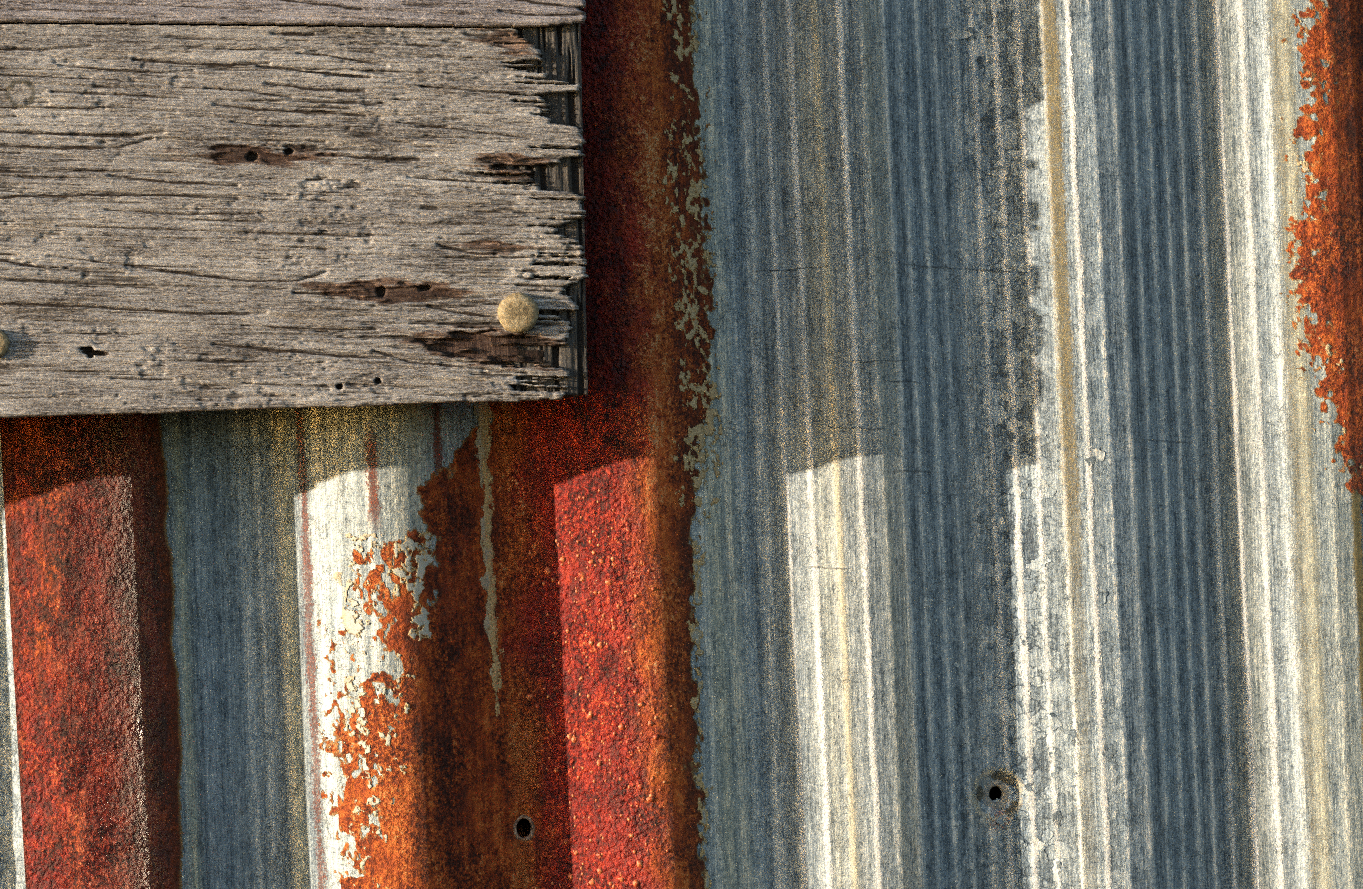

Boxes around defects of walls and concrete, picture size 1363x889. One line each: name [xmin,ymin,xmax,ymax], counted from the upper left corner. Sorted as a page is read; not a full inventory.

corrosion [0,413,184,889]
peeling [333,531,434,843]
corrosion [294,0,718,889]
corrosion [1278,0,1363,513]